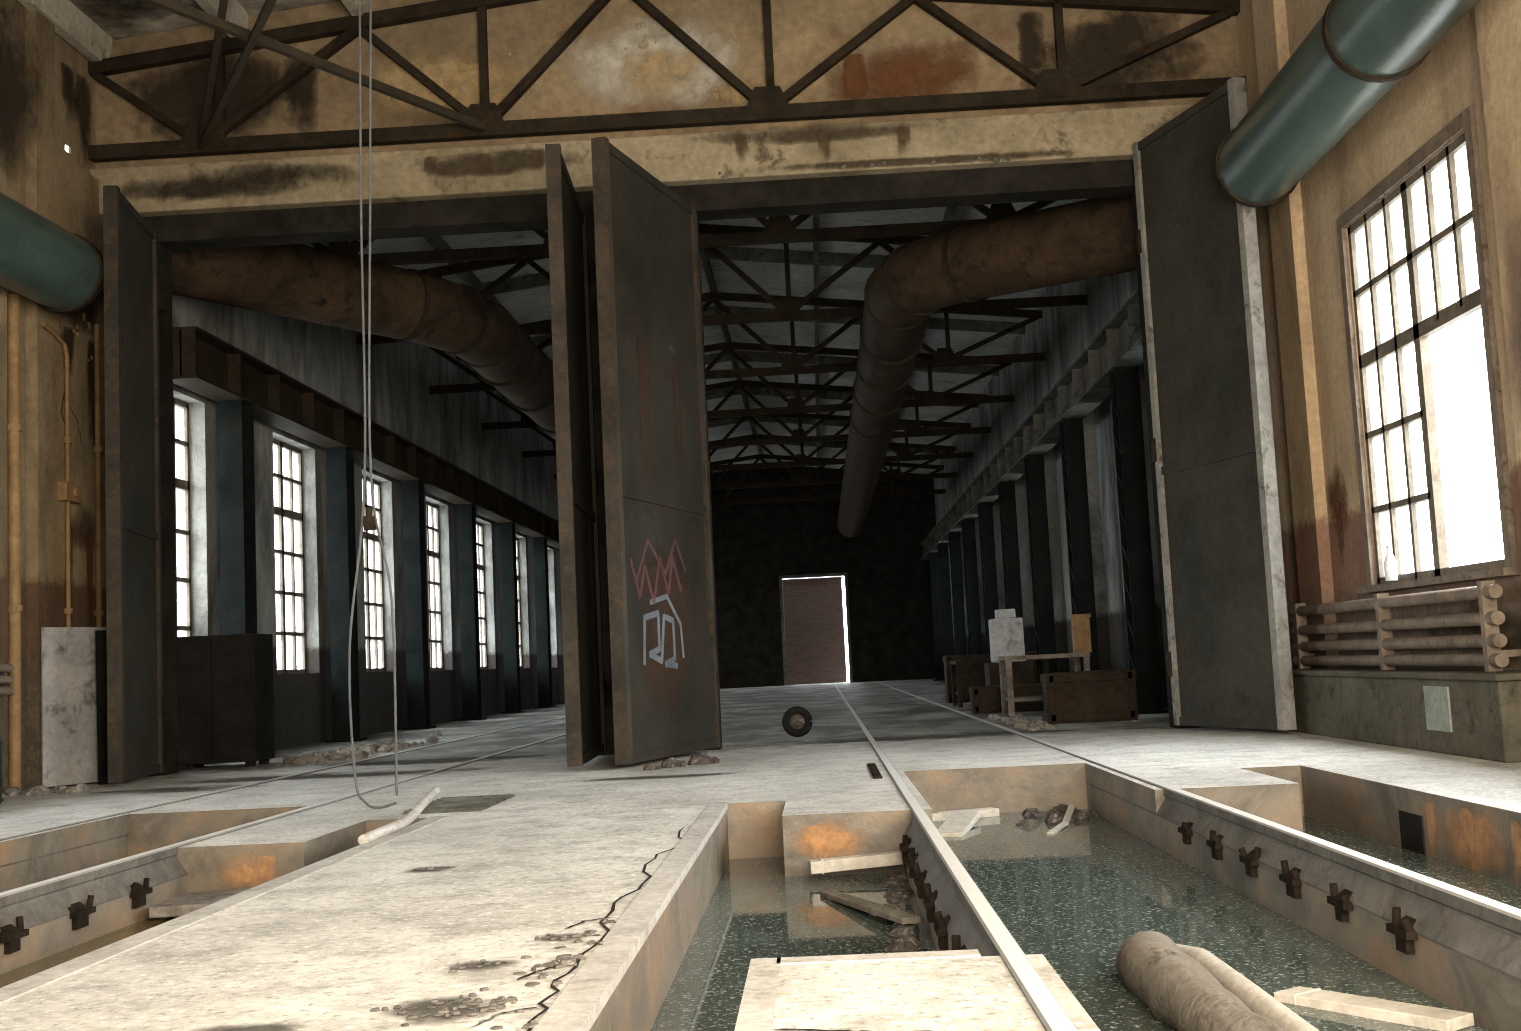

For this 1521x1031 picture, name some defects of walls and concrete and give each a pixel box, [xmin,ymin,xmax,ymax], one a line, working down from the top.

flaking render [571,21,754,103]
rust [802,826,857,858]
rust [1426,802,1521,869]
crack [472,827,684,1031]